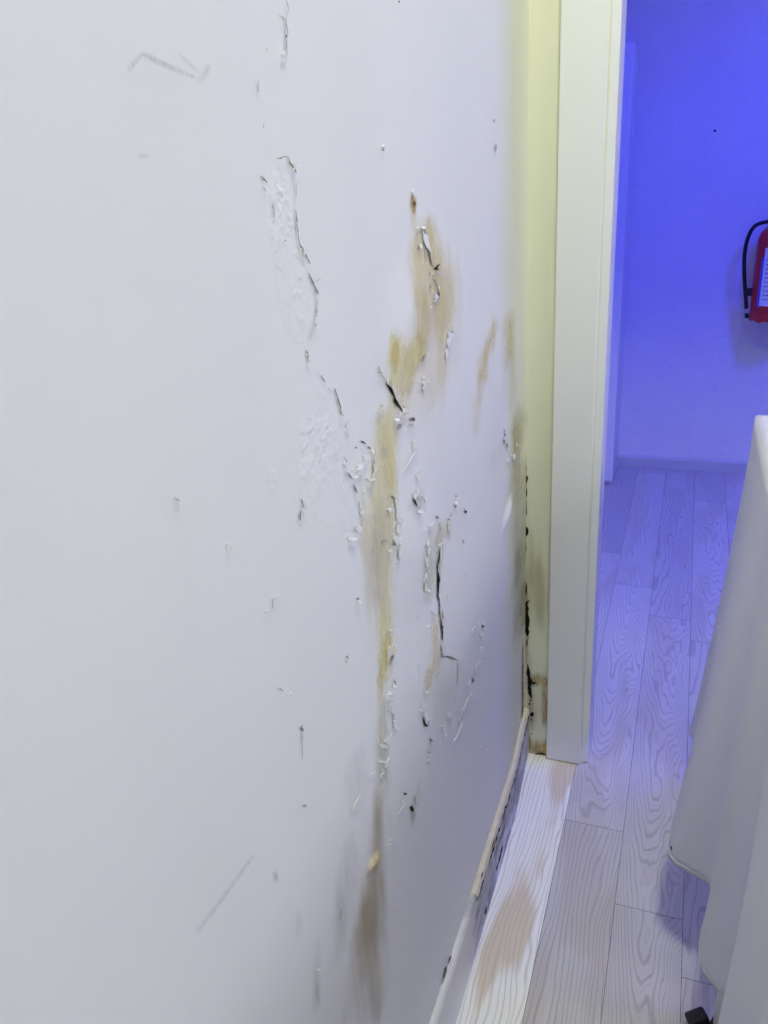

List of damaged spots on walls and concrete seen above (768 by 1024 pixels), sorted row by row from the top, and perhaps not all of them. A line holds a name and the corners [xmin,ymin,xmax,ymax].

damp [392,250,446,390]
crack [375,365,410,430]
damp [515,431,529,536]
crack [423,513,459,703]
damp [521,584,530,646]
damp [526,664,547,756]